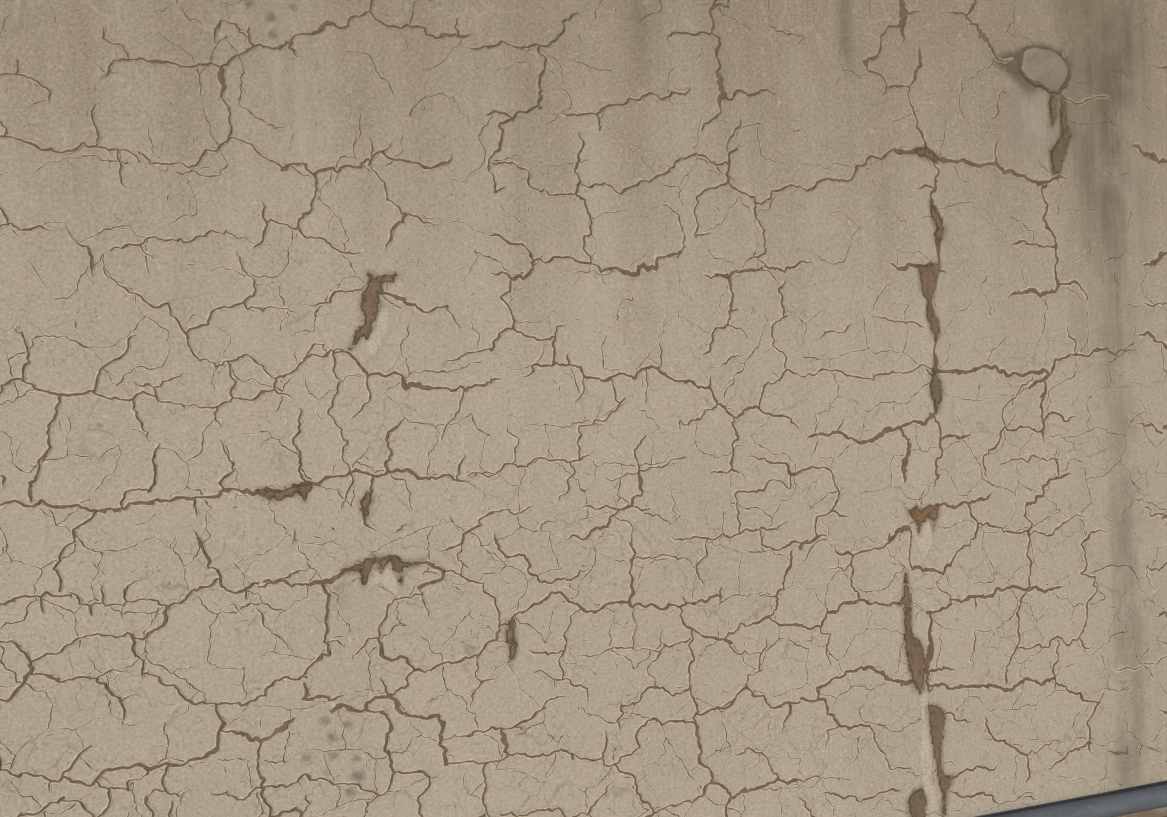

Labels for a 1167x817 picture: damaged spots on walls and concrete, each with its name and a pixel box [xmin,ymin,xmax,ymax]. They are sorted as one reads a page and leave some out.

crack [408,92,471,127]
crack [1051,0,1167,210]
spalling [348,271,397,351]
crack [377,281,461,329]
crack [817,316,852,340]
spalling [917,263,940,339]
spalling [929,359,944,409]
crack [0,473,8,489]
crack [359,495,378,532]
spalling [341,555,421,585]
spalling [505,620,517,660]
spalling [898,573,953,817]